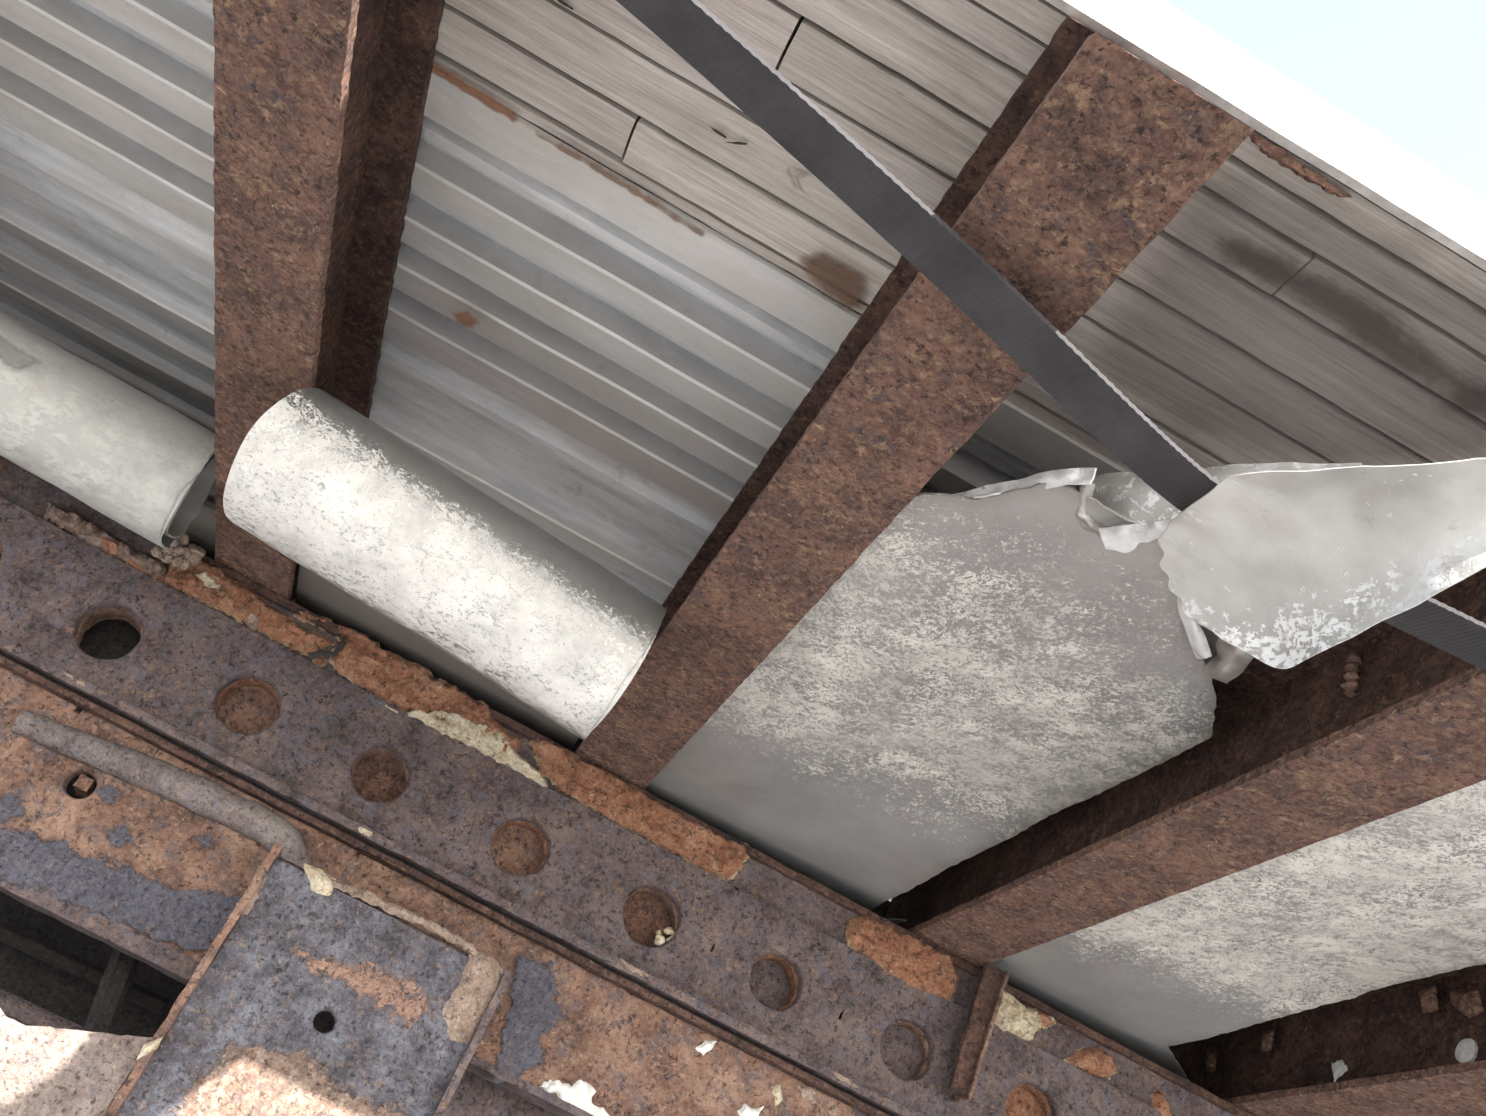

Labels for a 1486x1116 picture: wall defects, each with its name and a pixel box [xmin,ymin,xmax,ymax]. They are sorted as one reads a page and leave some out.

damp [802,255,862,308]
damp [1229,244,1486,412]
peeling [195,571,221,590]
corrosion [42,502,750,882]
peeling [380,703,556,792]
peeling [94,783,121,804]
peeling [0,788,242,951]
corrosion [287,863,503,1043]
corrosion [844,916,959,1002]
corrosion [173,1038,411,1116]
peeling [493,956,610,1116]
corrosion [994,990,1056,1042]